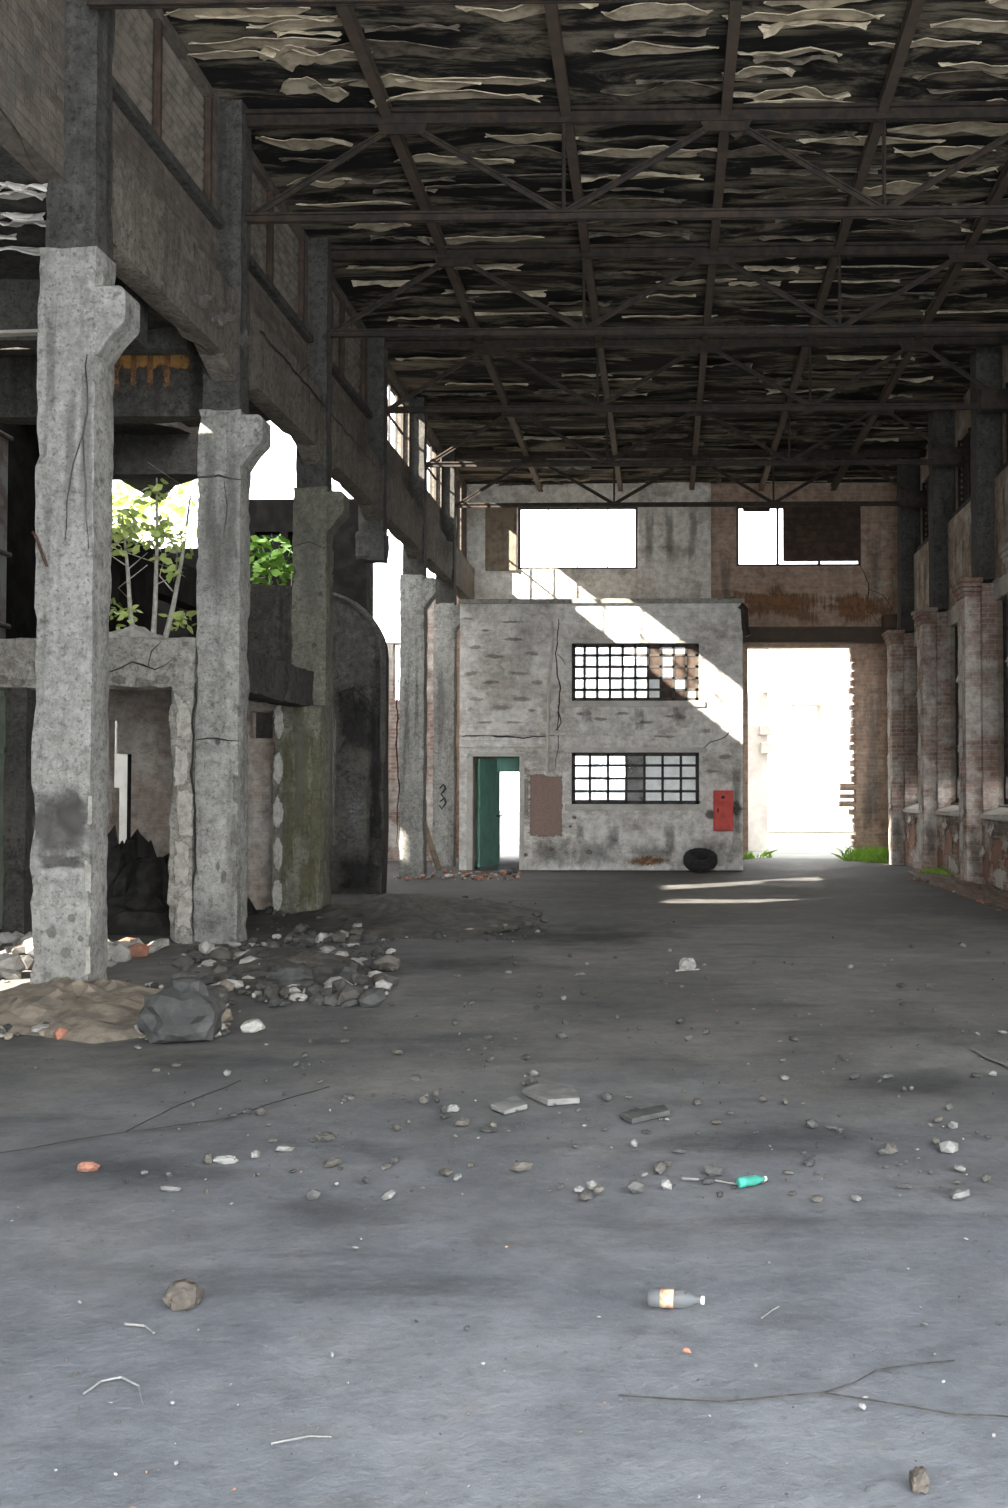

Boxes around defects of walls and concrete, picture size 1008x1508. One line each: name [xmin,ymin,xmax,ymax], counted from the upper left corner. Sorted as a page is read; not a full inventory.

peeling [164,0,1008,108]
flaking render [0,181,48,256]
peeling [255,121,1008,242]
peeling [346,222,1008,328]
peeling [420,355,958,486]
damp [43,856,80,868]
flaking render [0,675,401,1008]
damp [993,867,1008,891]
crack [0,1080,329,1153]